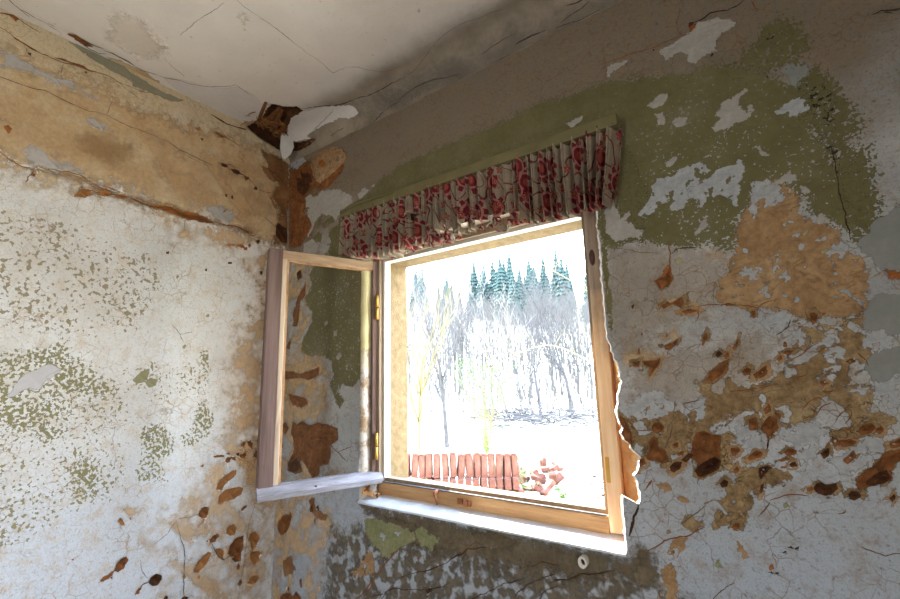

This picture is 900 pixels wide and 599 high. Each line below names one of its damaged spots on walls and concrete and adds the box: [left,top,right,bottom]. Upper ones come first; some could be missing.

crack [0,0,276,194]
flaking render [69,42,358,160]
crack [181,0,502,109]
peeling [282,11,900,531]
peeling [0,210,214,547]
spalling [135,574,162,595]
spalling [182,524,263,586]
spalling [197,439,258,526]
crack [356,542,486,599]
crack [472,561,612,599]
crack [629,480,705,555]
crack [758,494,846,517]